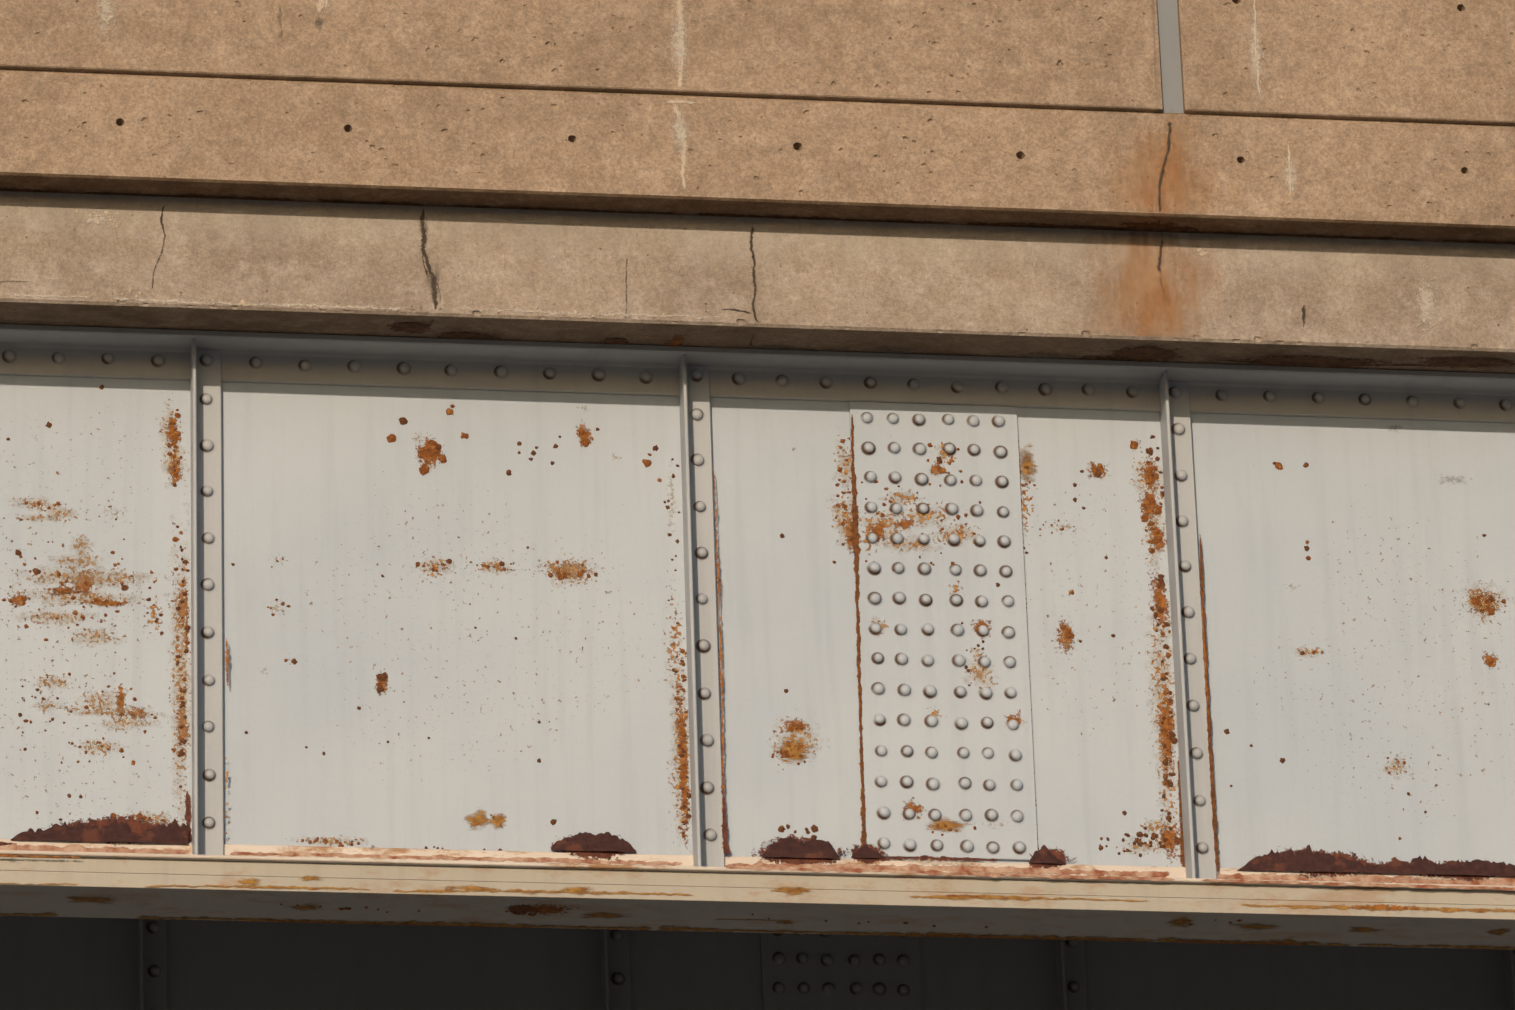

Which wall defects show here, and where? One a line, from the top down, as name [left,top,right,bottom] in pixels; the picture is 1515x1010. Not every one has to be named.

crack [152,206,166,288]
crack [420,209,441,329]
crack [723,228,759,346]
crack [1156,122,1172,302]
rust [386,417,447,476]
rust [517,407,600,465]
rust [642,445,681,513]
rust [0,399,192,858]
rust [139,489,1515,950]
rust [713,417,1185,902]